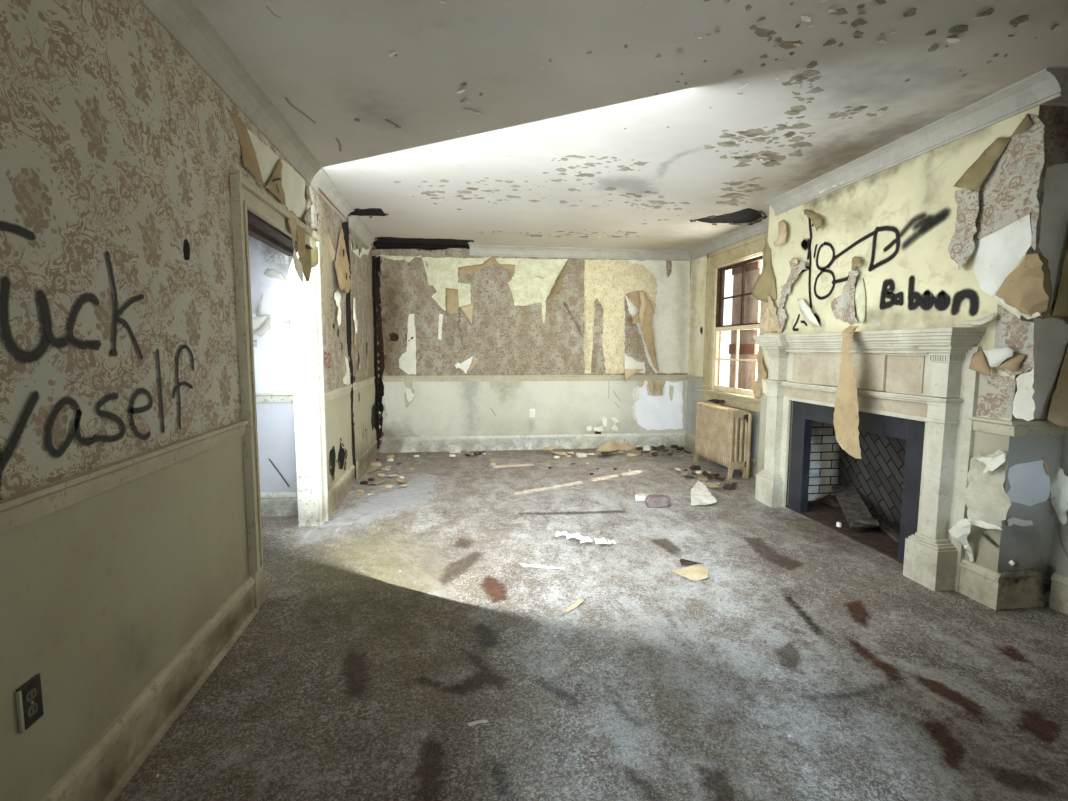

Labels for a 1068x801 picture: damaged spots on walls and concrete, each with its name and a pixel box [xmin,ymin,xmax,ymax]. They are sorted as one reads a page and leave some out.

peeling [820,0,887,47]
peeling [925,8,994,52]
peeling [1008,15,1029,37]
peeling [704,4,824,225]
peeling [828,106,889,119]
peeling [412,155,696,242]
crack [342,221,386,479]
peeling [587,416,619,434]
peeling [632,379,683,430]
peeling [948,449,1068,562]